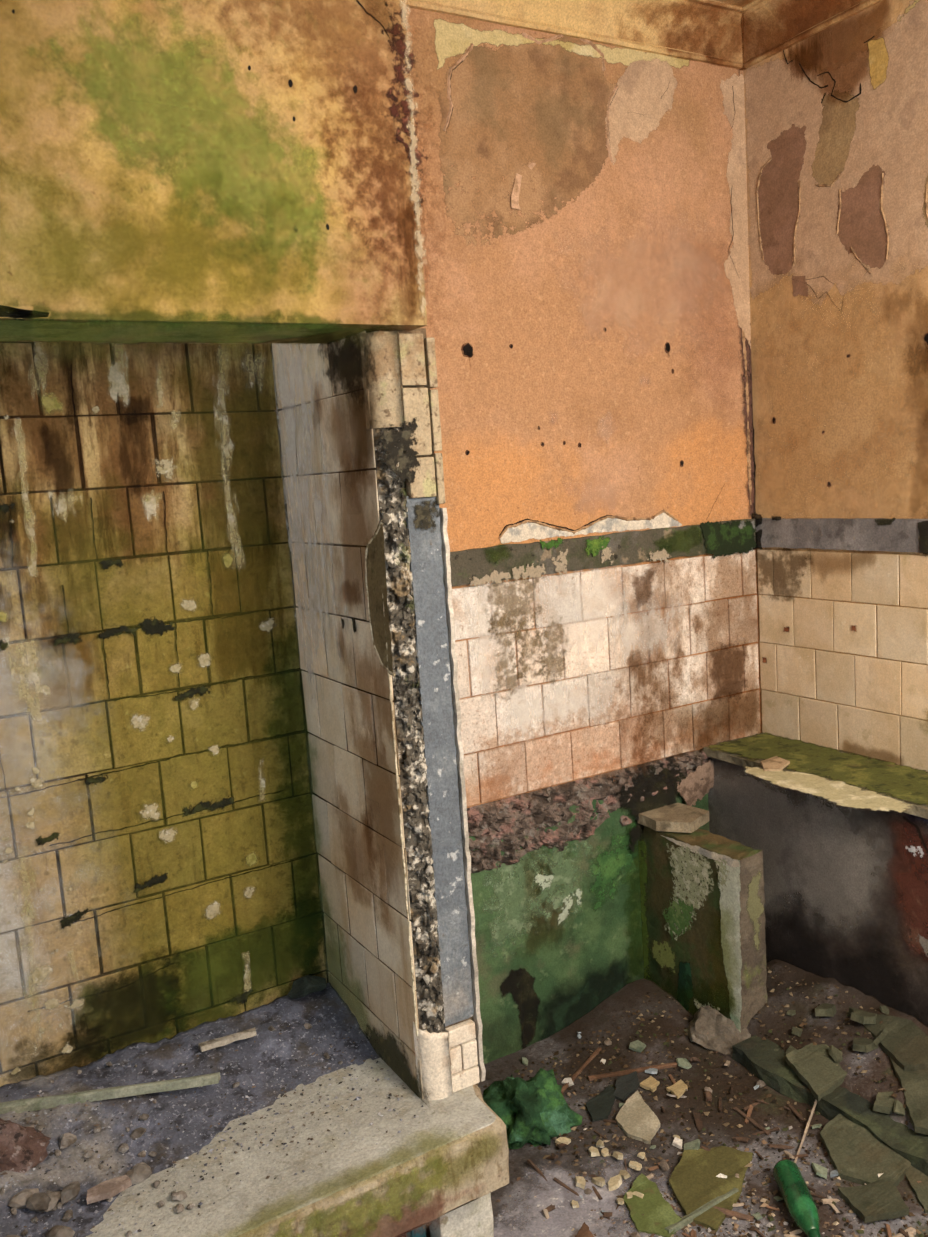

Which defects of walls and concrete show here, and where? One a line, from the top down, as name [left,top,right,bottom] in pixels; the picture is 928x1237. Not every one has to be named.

crack [356,0,395,40]
spalling [402,0,426,313]
flaking render [438,33,678,246]
peeling [720,0,928,349]
spalling [470,510,682,587]
damp [488,579,567,694]
peeling [915,934,928,957]